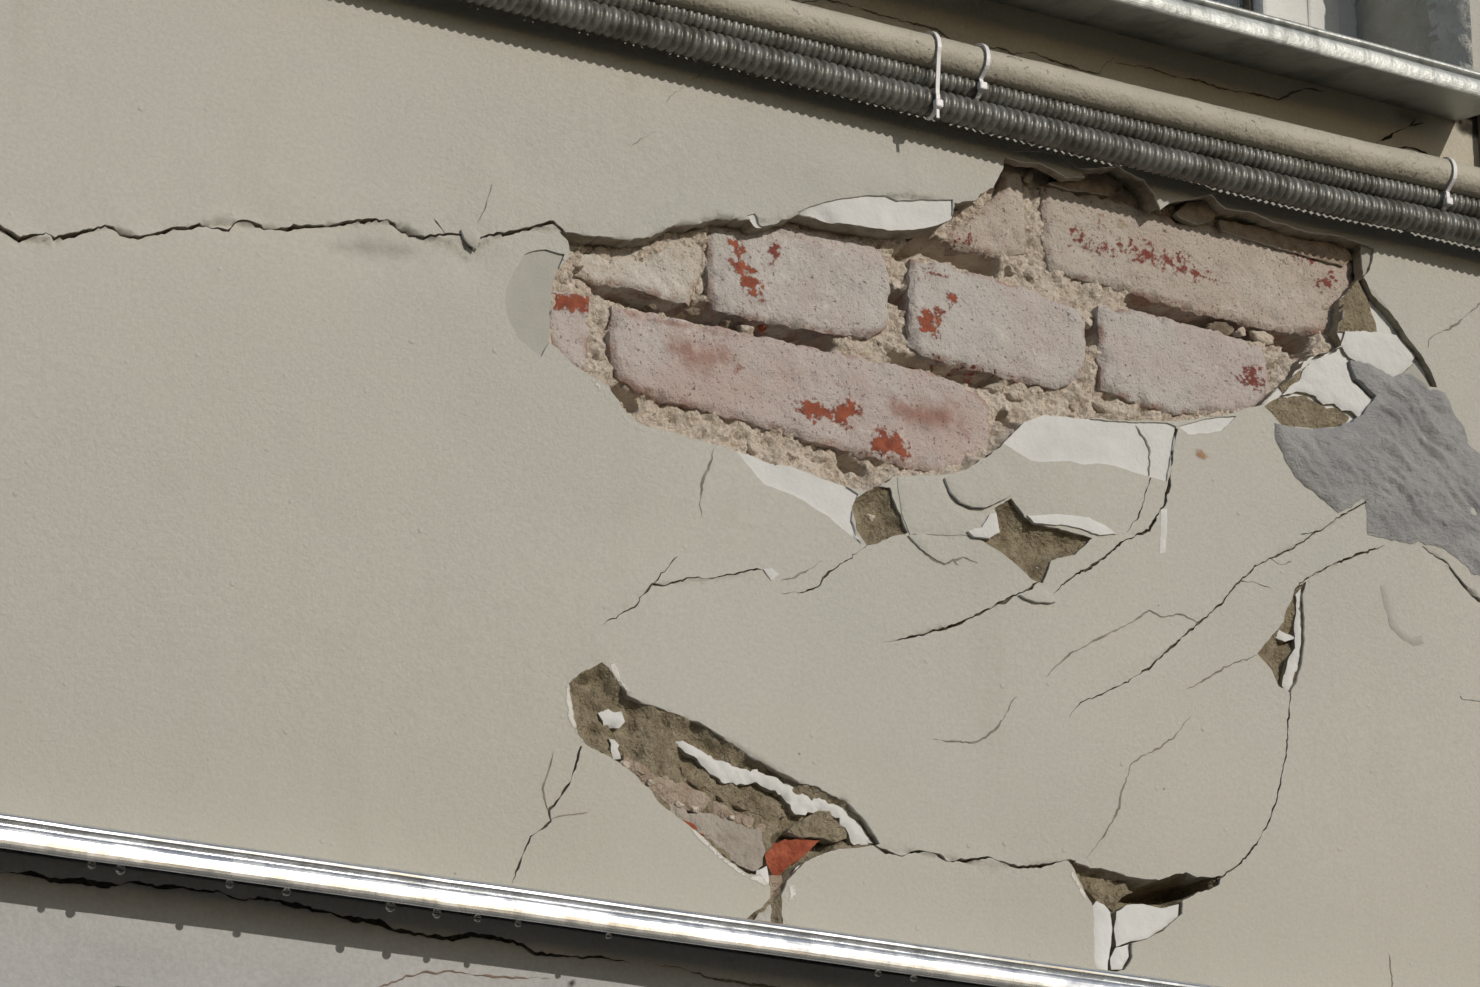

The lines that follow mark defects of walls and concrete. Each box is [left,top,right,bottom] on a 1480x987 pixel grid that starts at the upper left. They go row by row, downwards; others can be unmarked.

crack [0,181,566,253]
flaking render [505,151,1437,604]
crack [604,546,866,624]
crack [882,426,1178,643]
crack [1047,503,1385,717]
flaking render [1257,582,1306,693]
crack [512,746,587,883]
flaking render [566,662,880,924]
crack [875,655,1255,869]
crack [1217,691,1291,880]
crack [0,870,777,987]
flaking render [1070,862,1221,972]